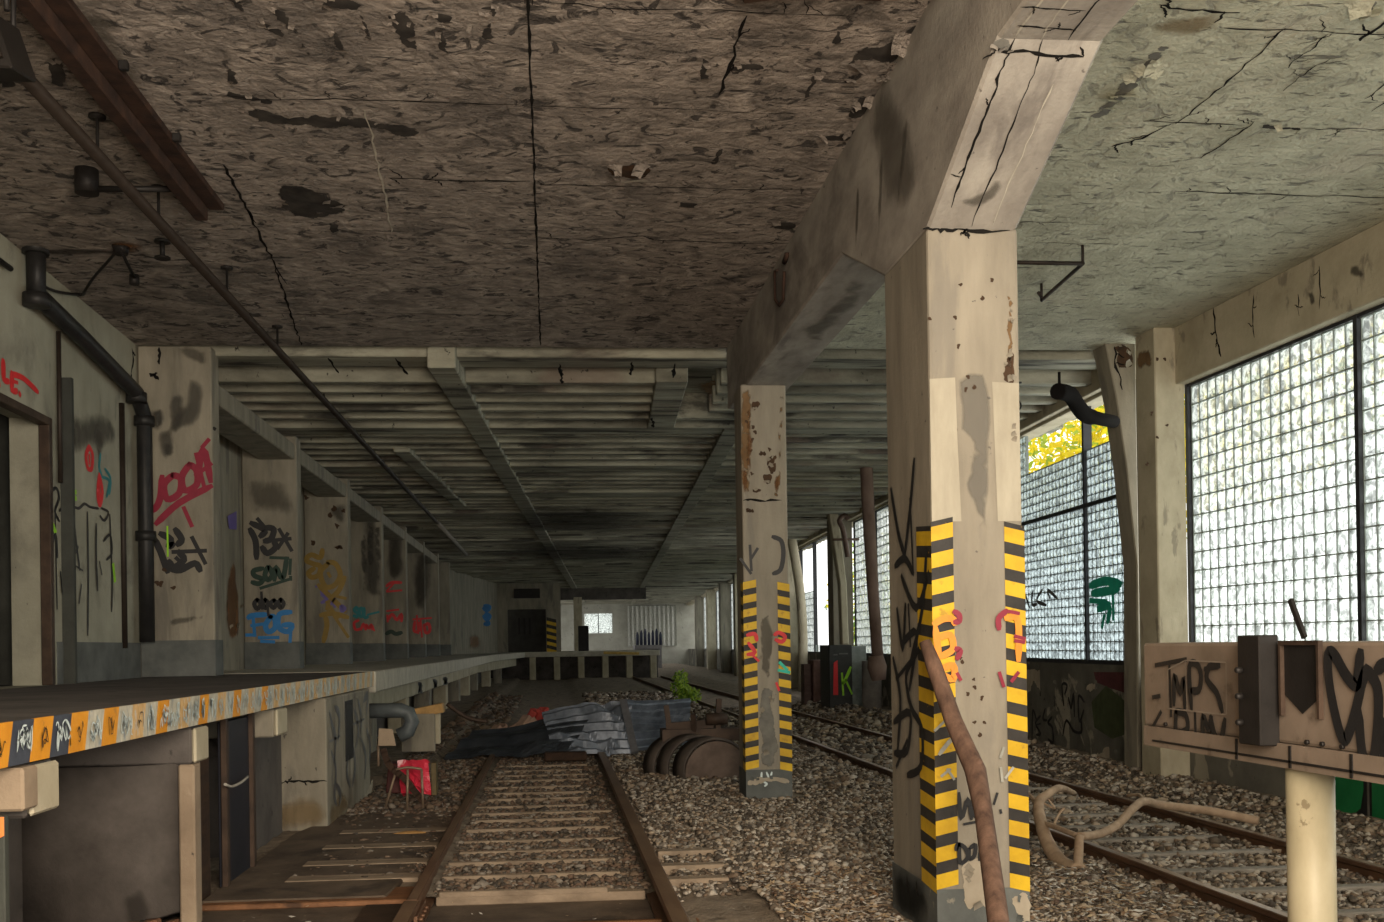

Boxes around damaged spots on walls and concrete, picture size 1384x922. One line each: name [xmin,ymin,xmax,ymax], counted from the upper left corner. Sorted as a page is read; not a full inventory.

peeling [278,186,346,233]
crack [223,0,851,384]
crack [923,0,1102,246]
crack [1111,0,1384,201]
rust [741,390,752,491]